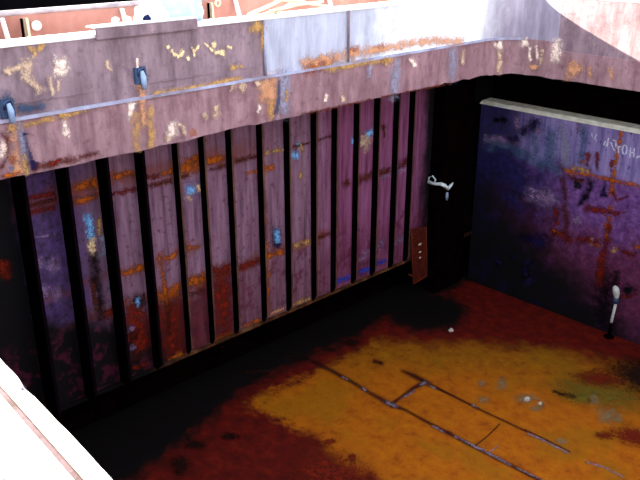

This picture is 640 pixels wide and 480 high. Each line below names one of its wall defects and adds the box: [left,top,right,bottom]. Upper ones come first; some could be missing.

peeling [4,56,42,95]
peeling [49,55,69,96]
peeling [167,41,232,61]
corrosion [300,36,464,74]
peeling [494,40,503,74]
peeling [521,37,562,70]
corrosion [132,65,243,151]
corrosion [259,77,278,117]
corrosion [549,131,640,287]
corrosion [239,236,284,315]
corrosion [157,252,186,361]
corrosion [212,263,234,340]